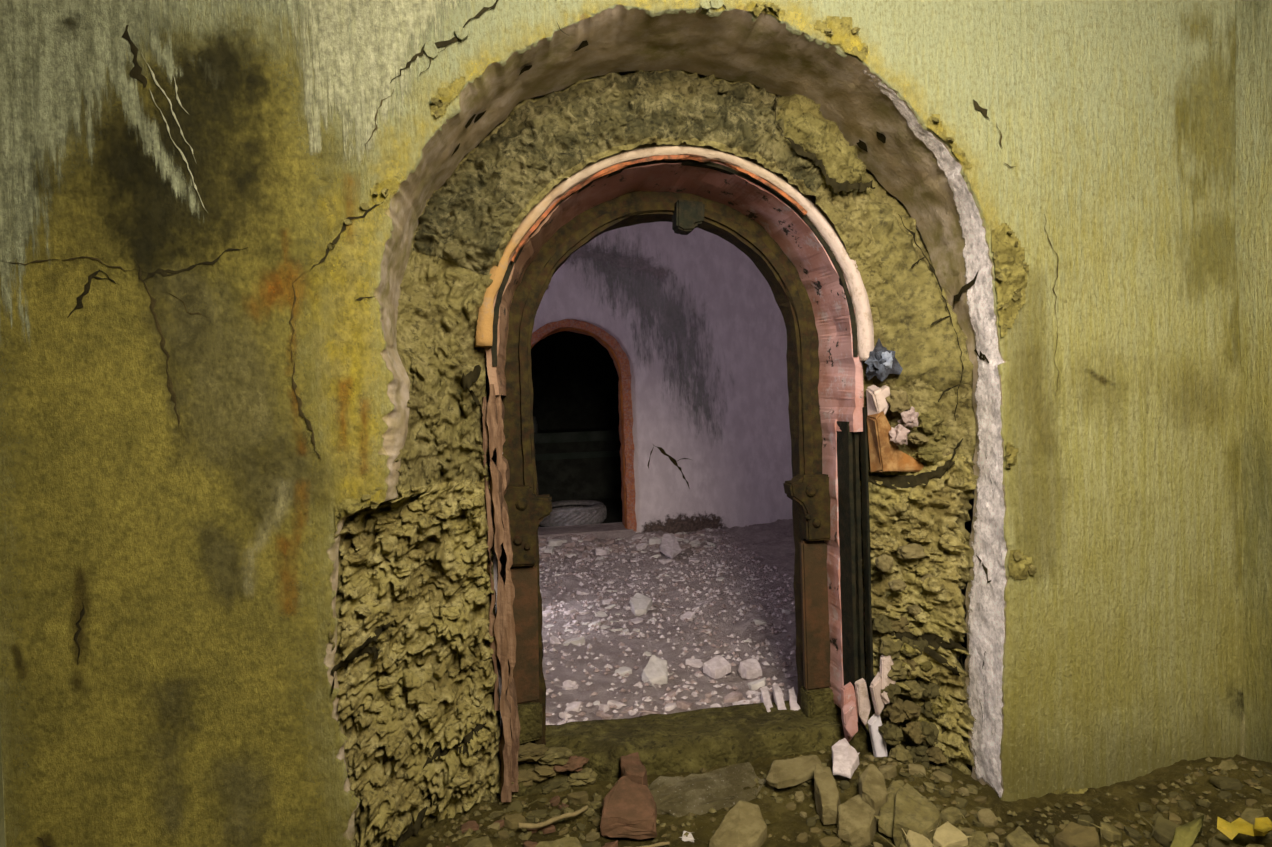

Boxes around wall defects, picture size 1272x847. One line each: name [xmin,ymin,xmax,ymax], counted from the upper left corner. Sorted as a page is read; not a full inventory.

crack [366,0,498,144]
spalling [413,70,822,276]
crack [0,247,248,439]
damp [0,36,404,847]
crack [289,201,384,460]
spalling [814,16,1037,798]
spalling [334,474,501,847]